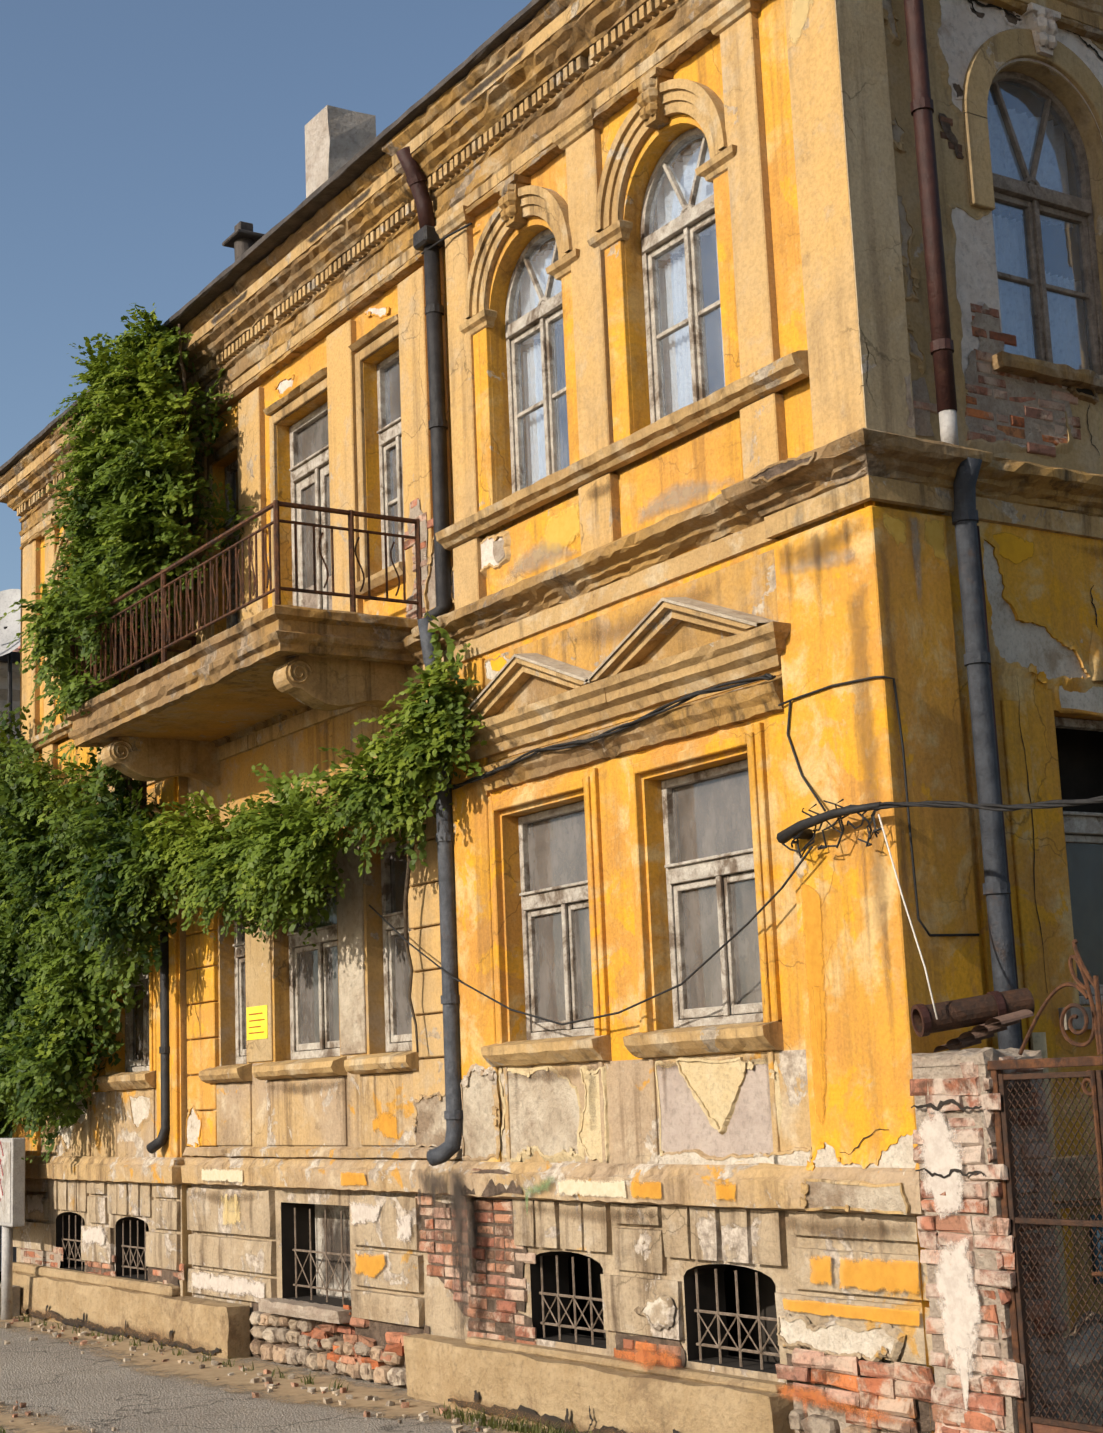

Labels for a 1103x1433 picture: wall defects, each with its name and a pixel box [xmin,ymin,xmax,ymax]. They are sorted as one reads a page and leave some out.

flaking render [926,0,1026,159]
flaking render [1055,28,1103,87]
flaking render [945,201,1081,459]
peeling [980,531,1095,693]
flaking render [20,1245,63,1268]
flaking render [81,1226,117,1277]
flaking render [350,1202,380,1225]
flaking render [397,1063,585,1345]
flaking render [655,1058,964,1218]
flaking render [775,1237,997,1433]